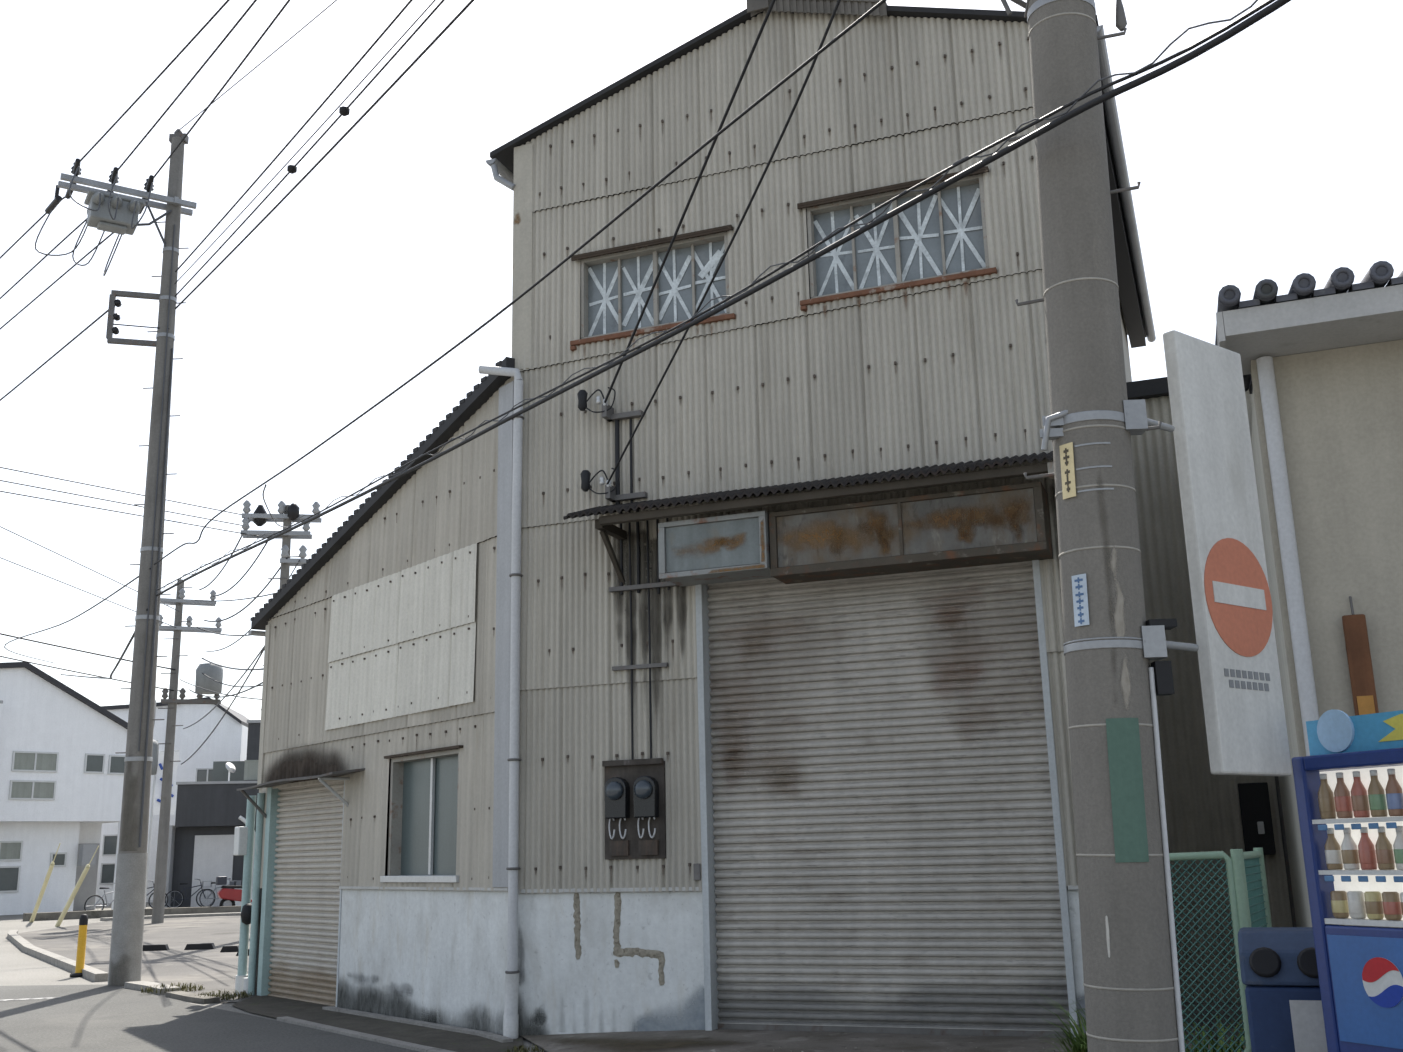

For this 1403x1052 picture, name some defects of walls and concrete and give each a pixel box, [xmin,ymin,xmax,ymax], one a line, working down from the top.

corrosion [704,535,743,551]
crack [573,892,665,986]
damp [337,977,444,1024]
damp [463,1011,492,1033]